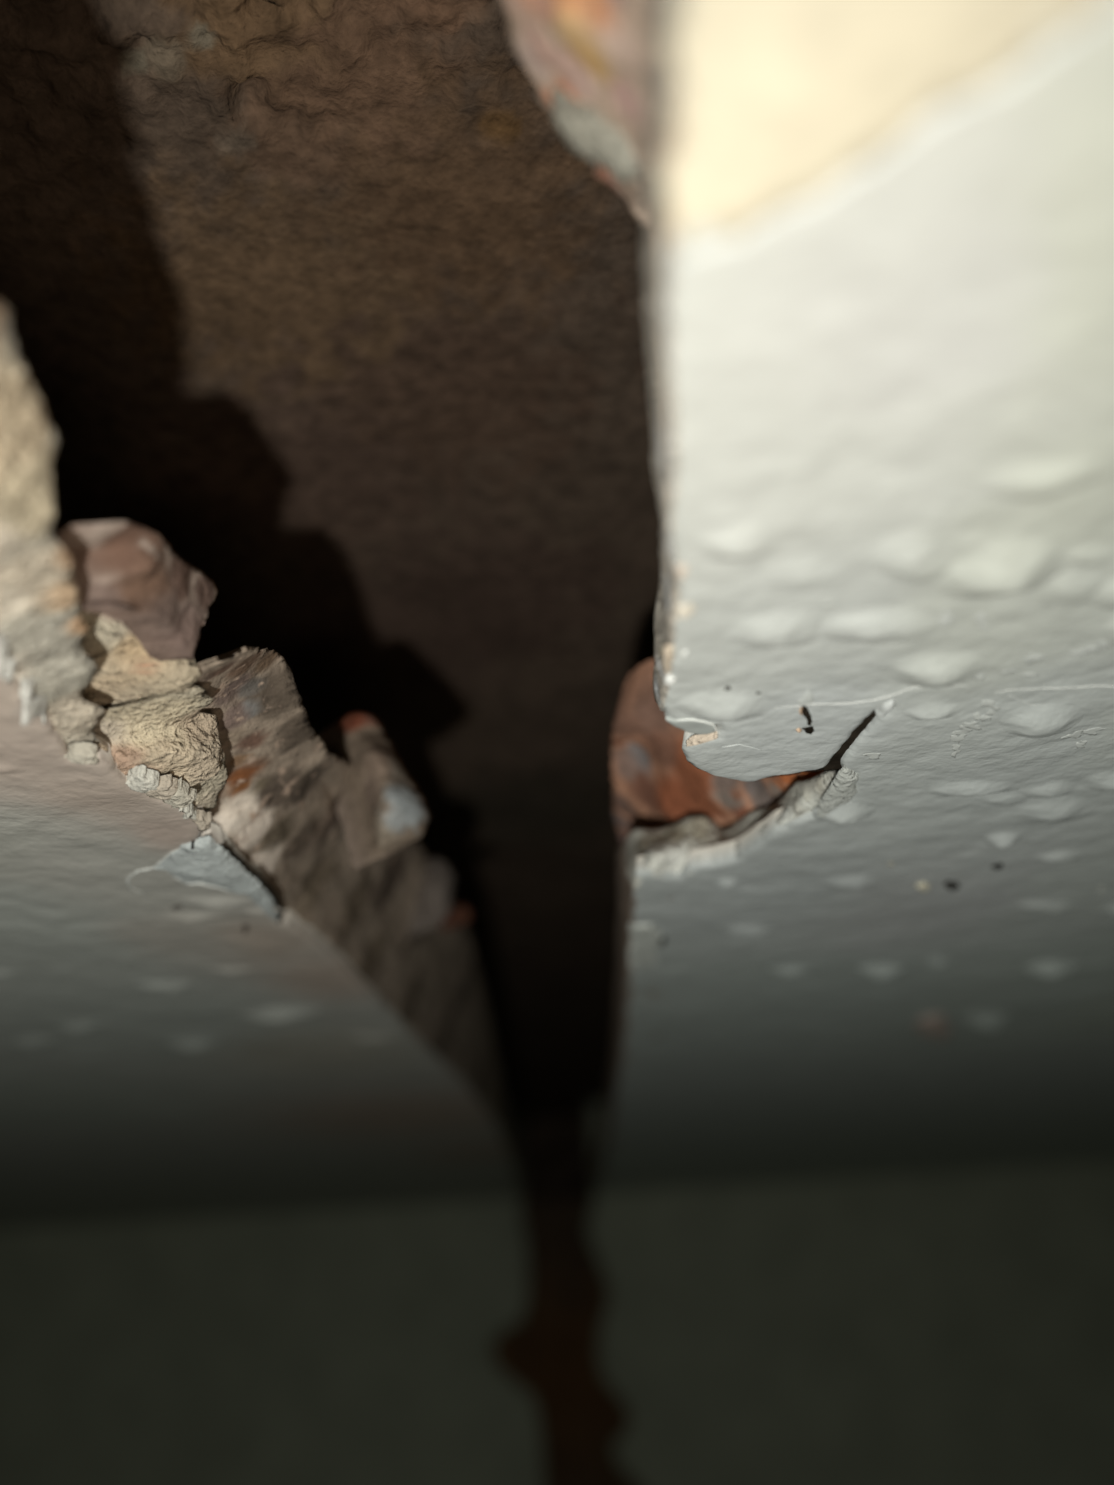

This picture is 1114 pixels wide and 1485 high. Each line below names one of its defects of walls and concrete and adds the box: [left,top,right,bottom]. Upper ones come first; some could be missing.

peeling [63,742,99,765]
flaking render [125,765,283,923]
flaking render [320,711,431,869]
flaking render [610,644,859,890]
crack [776,686,921,771]
crack [950,640,1114,758]